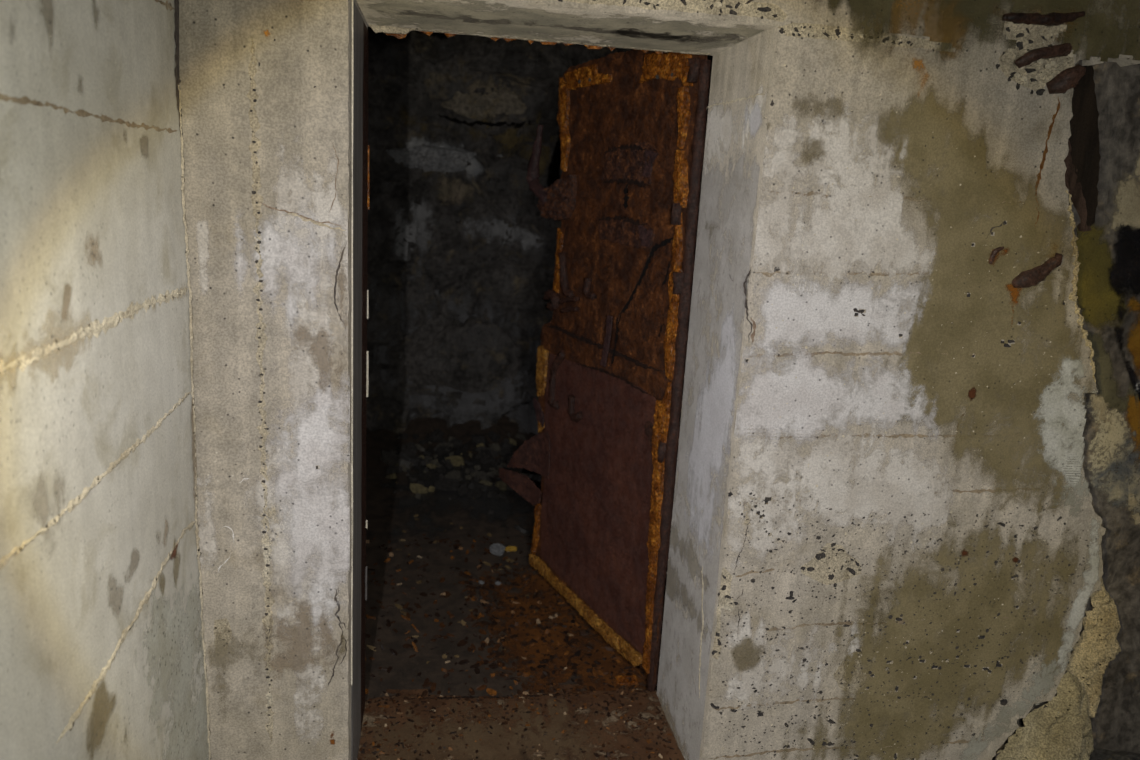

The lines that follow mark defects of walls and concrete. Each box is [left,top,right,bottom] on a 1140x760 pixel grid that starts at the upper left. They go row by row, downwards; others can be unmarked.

spalling [996,11,1086,96]
peeling [1011,190,1096,383]
water stain [657,87,1140,760]
spalling [1067,577,1121,718]